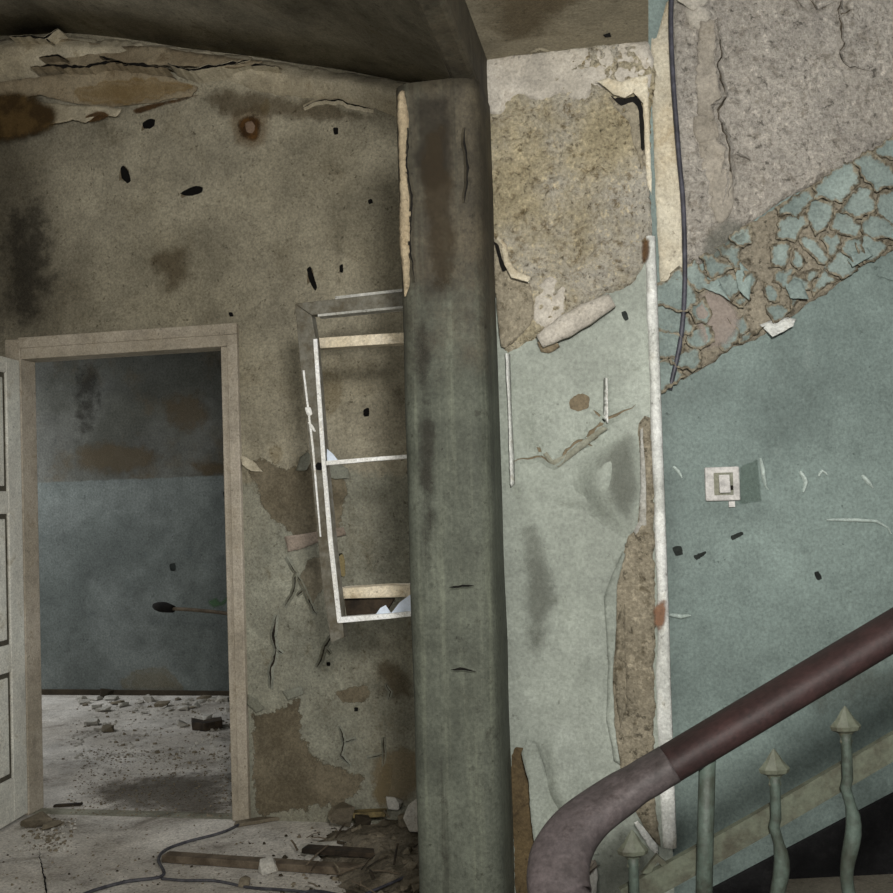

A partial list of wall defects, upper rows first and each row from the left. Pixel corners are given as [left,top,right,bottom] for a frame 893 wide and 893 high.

crack [795,0,869,73]
water stain [0,93,55,140]
peeling [0,37,411,297]
rust [238,116,260,141]
flaking render [487,0,893,490]
spalling [241,452,318,552]
spalling [330,465,349,537]
spalling [604,416,656,768]
spalling [247,685,416,816]
crack [37,850,49,893]
spalling [511,739,558,893]
spalling [634,798,661,854]